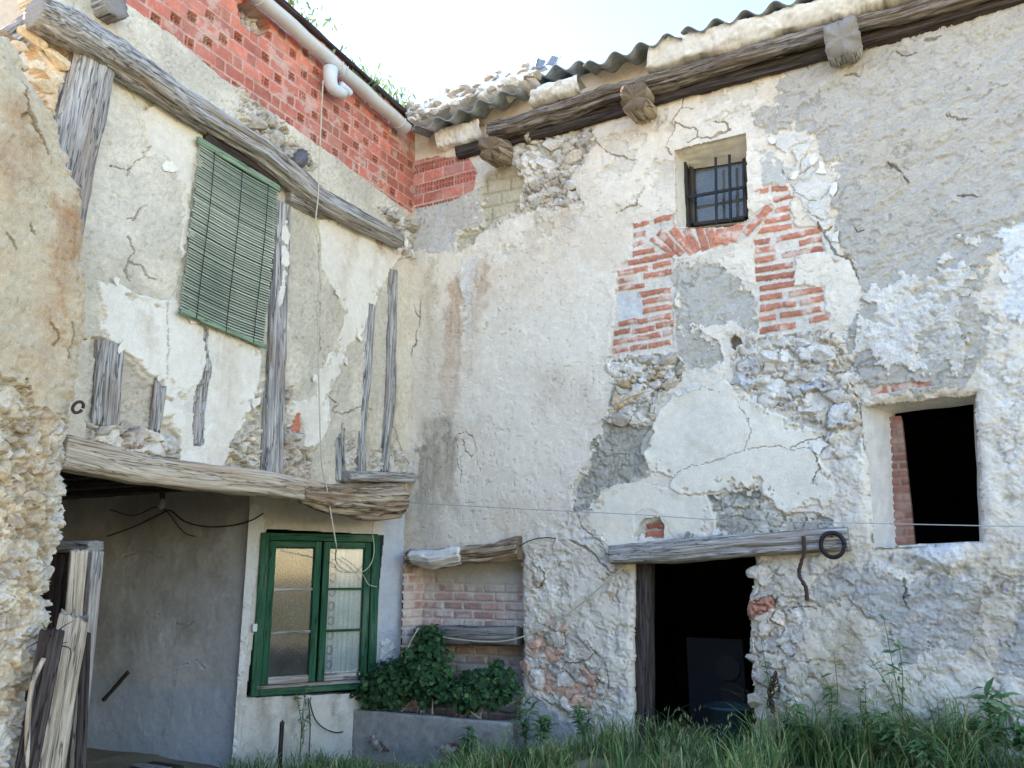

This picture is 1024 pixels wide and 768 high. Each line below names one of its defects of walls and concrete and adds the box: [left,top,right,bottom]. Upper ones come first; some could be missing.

crack [110,145,152,176]
crack [666,104,732,155]
peeling [83,277,266,470]
peeling [278,220,291,309]
peeling [283,127,597,479]
peeling [570,129,982,545]
crack [455,431,478,478]
crack [673,398,825,483]